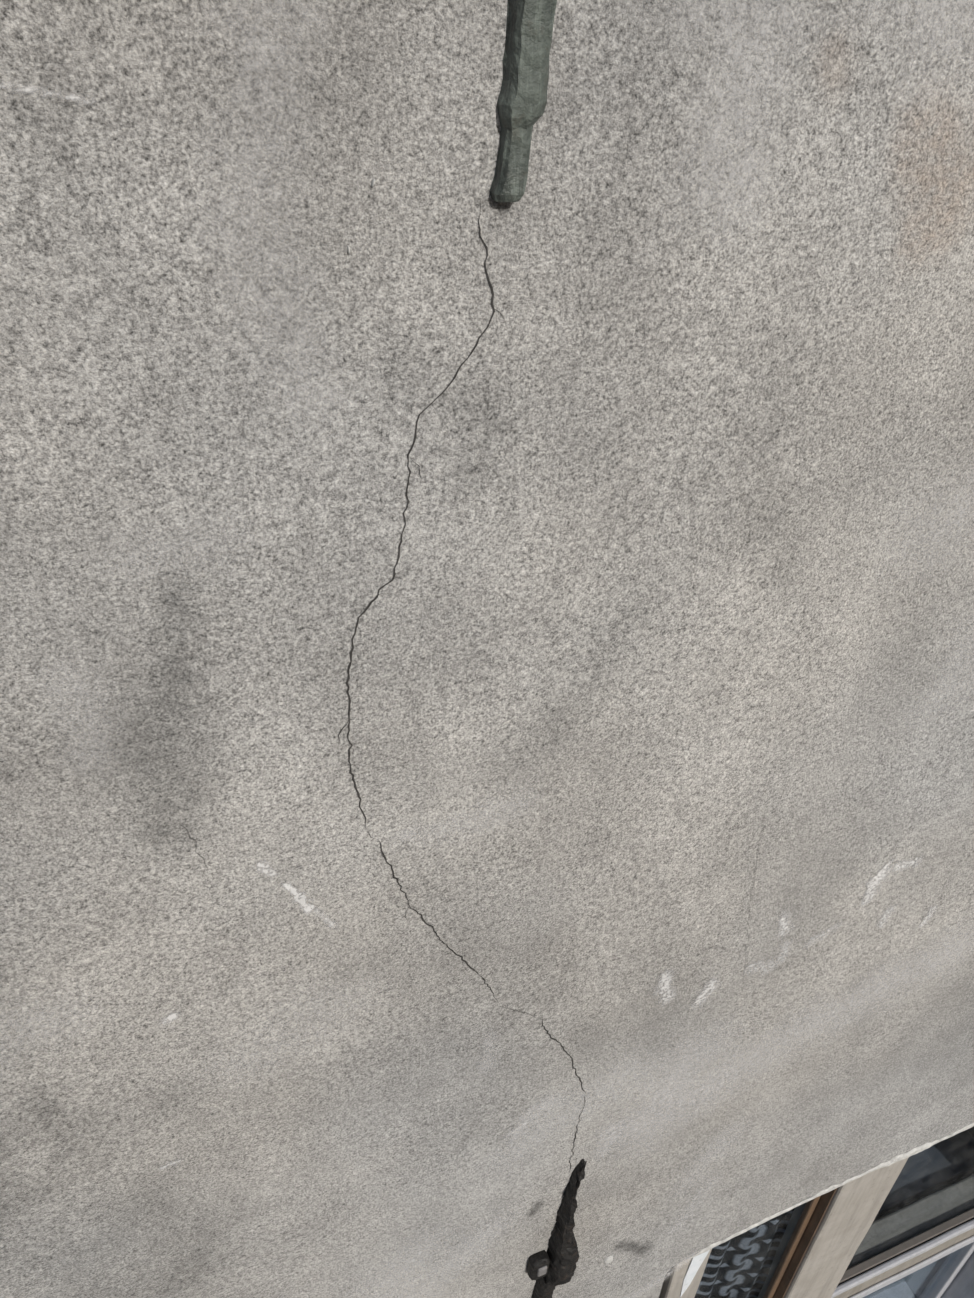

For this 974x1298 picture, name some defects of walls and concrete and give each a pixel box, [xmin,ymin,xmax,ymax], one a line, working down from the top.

crack [338,202,585,1170]